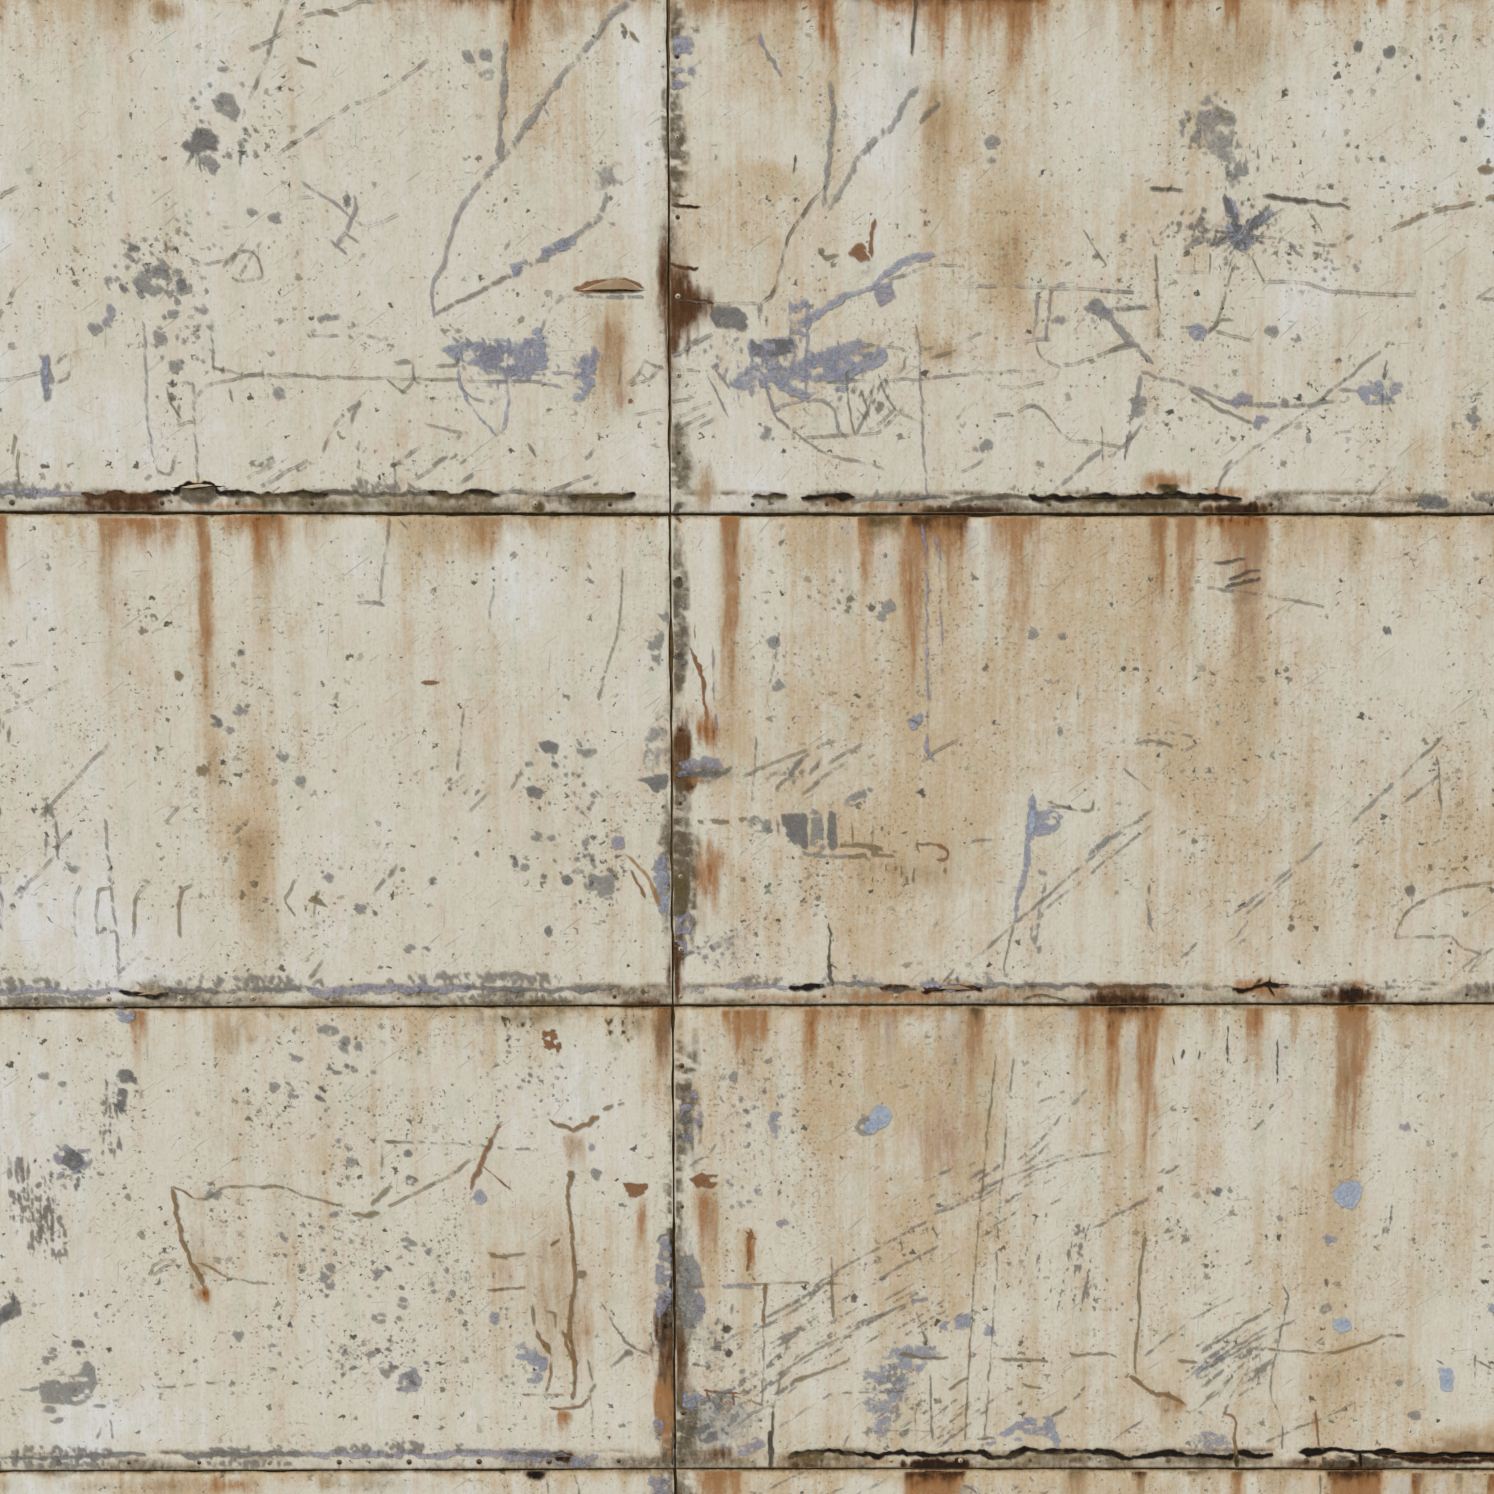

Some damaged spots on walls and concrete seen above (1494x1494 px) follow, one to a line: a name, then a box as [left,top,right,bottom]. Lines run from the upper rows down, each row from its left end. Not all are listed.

rust [574,248,714,366]
rust [858,502,1037,665]
rust [623,553,741,1494]
rust [1081,986,1164,1150]
rust [526,1471,545,1480]
rust [886,1458,970,1494]
rust [1293,1460,1388,1494]